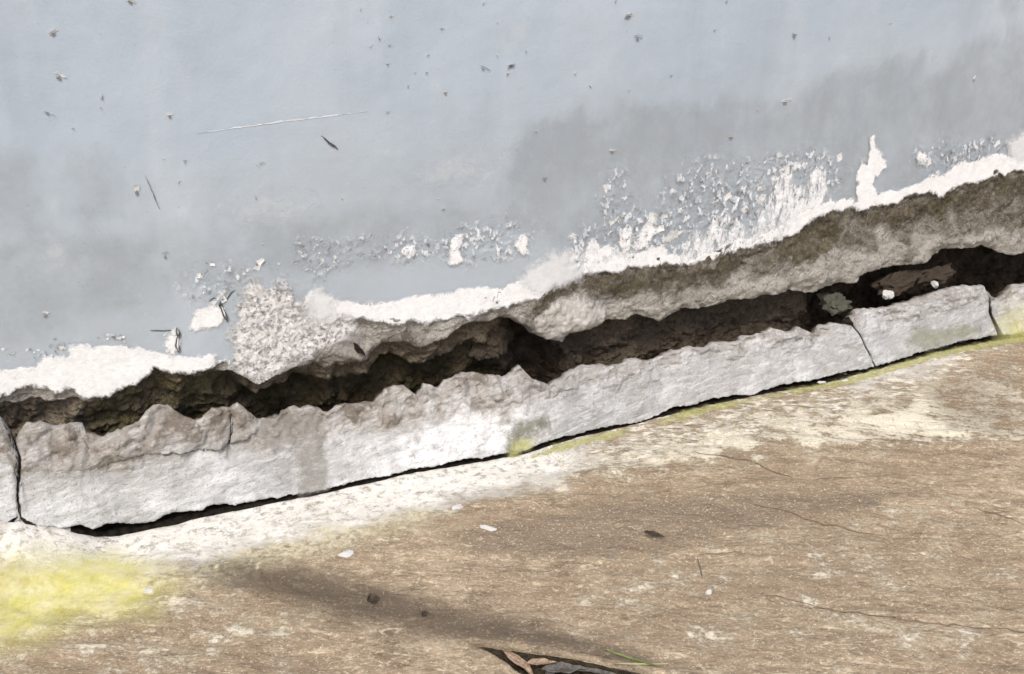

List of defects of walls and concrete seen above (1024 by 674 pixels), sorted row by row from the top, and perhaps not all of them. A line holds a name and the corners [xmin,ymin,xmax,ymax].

spalling [0,132,1024,402]
crack [0,245,1024,537]